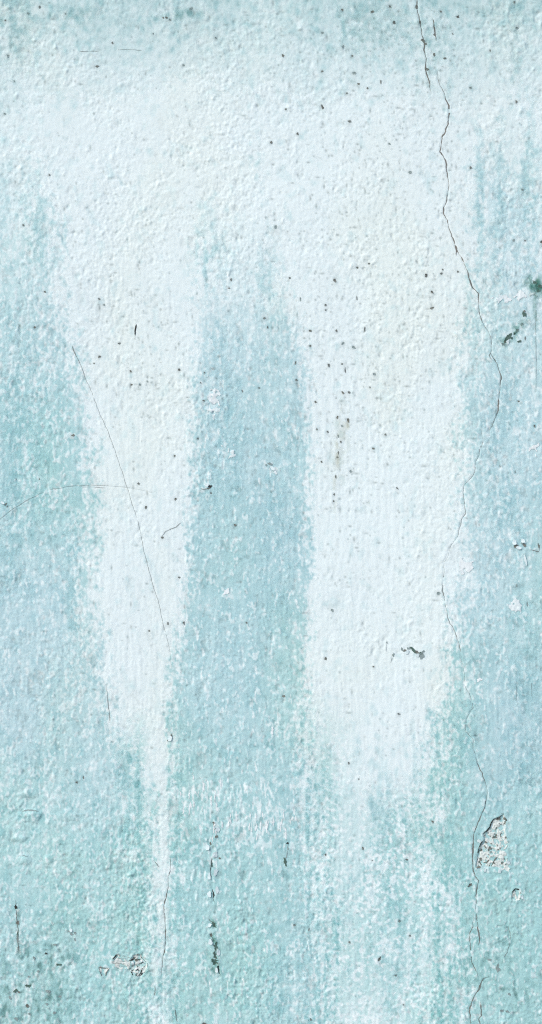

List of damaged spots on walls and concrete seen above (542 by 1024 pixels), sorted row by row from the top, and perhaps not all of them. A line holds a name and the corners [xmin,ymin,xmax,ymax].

crack [415,1,502,651]
crack [464,677,511,1023]
spalling [476,813,510,873]